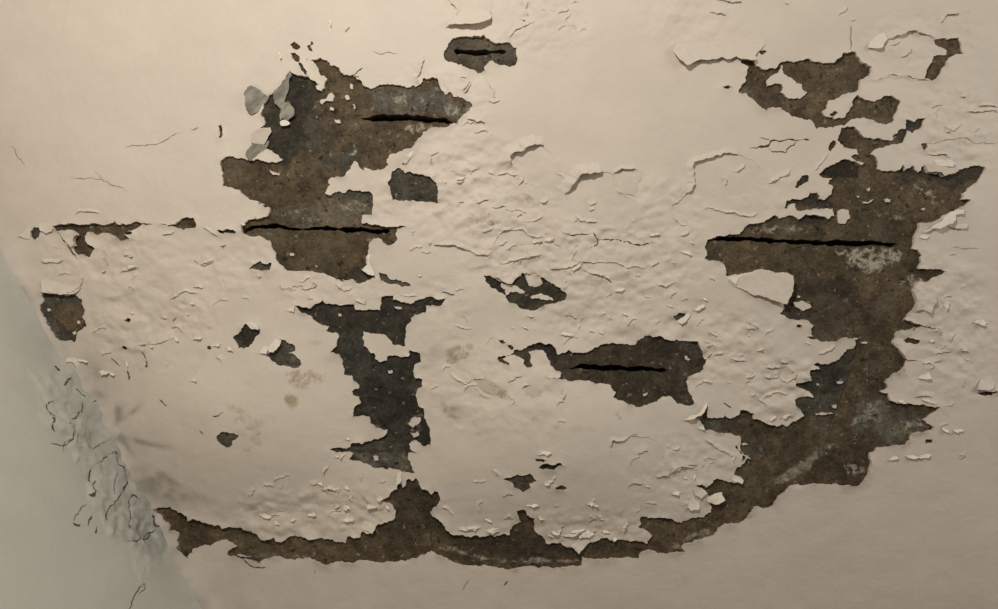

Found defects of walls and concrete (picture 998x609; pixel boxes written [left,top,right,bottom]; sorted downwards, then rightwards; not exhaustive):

crack [372,117,449,125]
crack [254,225,390,234]
crack [713,238,889,247]
spalling [19,208,142,342]
spalling [157,0,984,570]
crack [572,363,664,371]
crack [46,366,160,542]